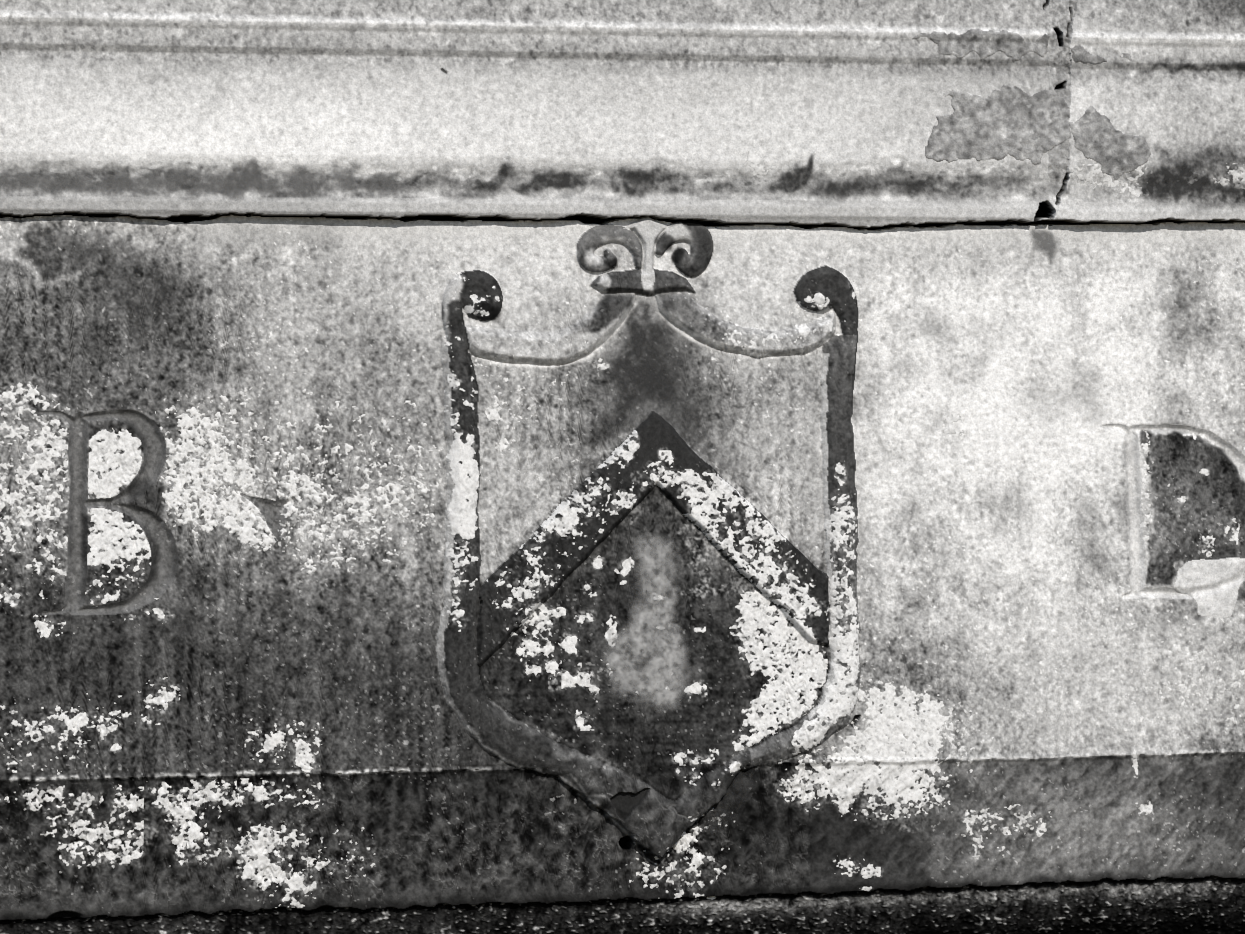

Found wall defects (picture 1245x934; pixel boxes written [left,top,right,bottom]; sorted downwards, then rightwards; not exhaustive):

crack [1043,0,1074,38]
peeling [925,85,1153,199]
water stain [613,303,672,399]
water stain [607,539,684,705]